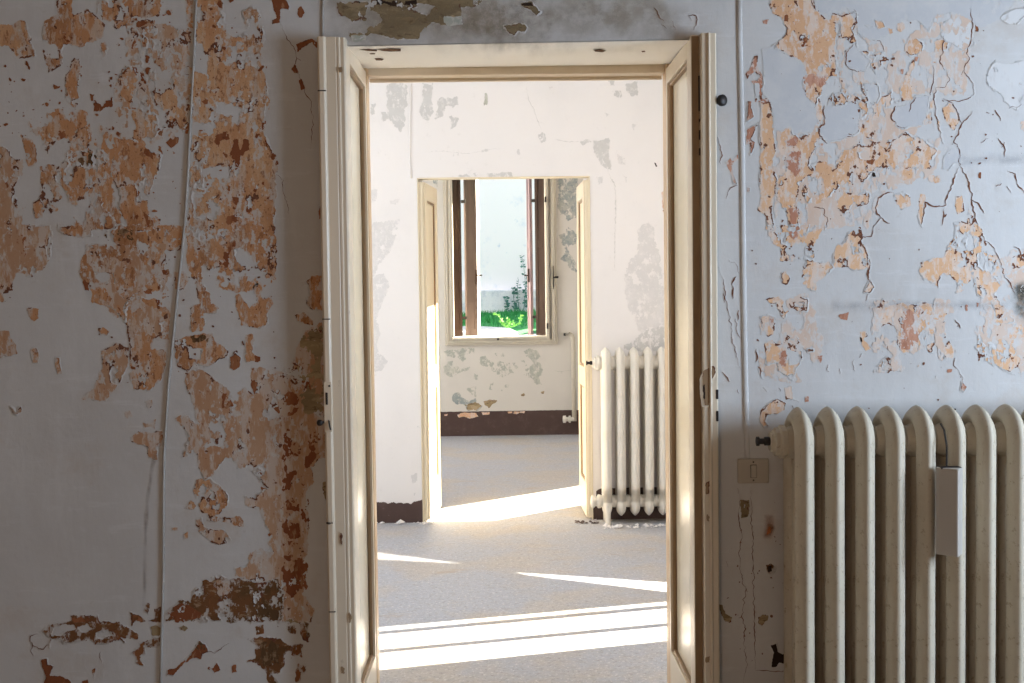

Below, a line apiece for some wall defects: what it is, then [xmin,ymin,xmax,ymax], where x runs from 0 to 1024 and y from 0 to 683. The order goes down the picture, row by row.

peeling [337,0,483,61]
peeling [503,0,542,37]
crack [818,18,884,143]
crack [890,13,1024,293]
peeling [725,0,1024,429]
crack [860,192,894,301]
peeling [0,0,326,683]
peeling [443,347,544,419]
peeling [739,499,751,519]
crack [726,487,784,683]
spalling [769,642,784,667]